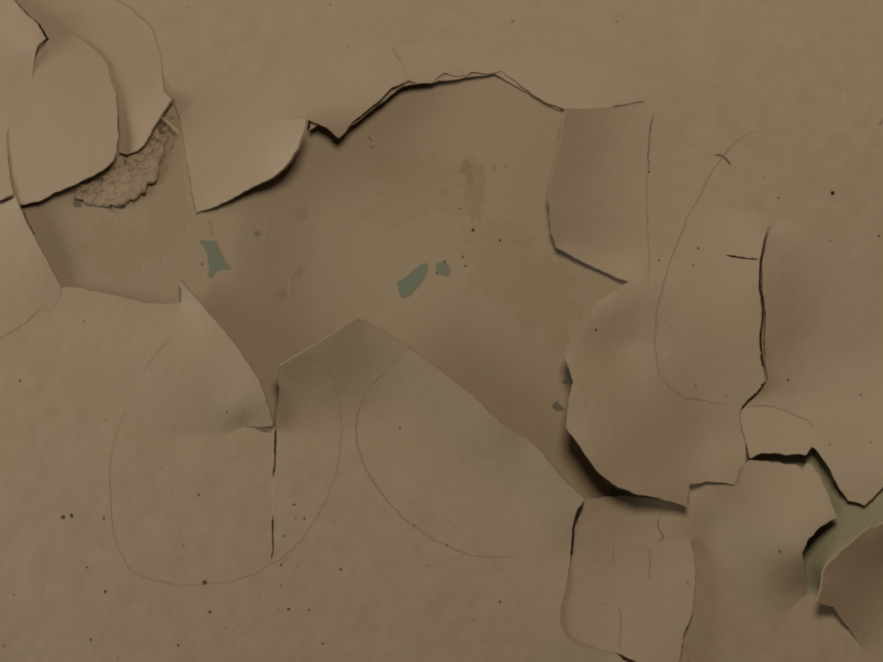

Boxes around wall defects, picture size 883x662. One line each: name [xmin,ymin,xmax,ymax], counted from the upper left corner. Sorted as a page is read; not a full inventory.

crack [109,346,520,586]
flaking render [0,0,696,662]
peeling [547,101,773,282]
crack [613,101,814,428]
peeling [563,210,883,651]